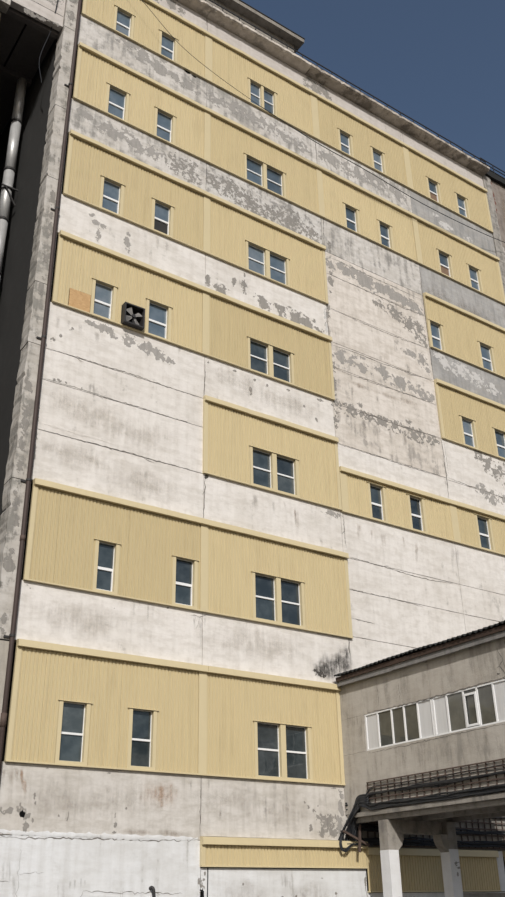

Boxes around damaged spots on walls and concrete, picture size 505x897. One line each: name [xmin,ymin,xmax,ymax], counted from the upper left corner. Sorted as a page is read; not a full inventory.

peeling [115,37,408,201]
peeling [76,106,502,396]
peeling [317,349,440,446]
peeling [474,450,505,506]
crack [0,782,201,842]
peeling [304,787,344,838]